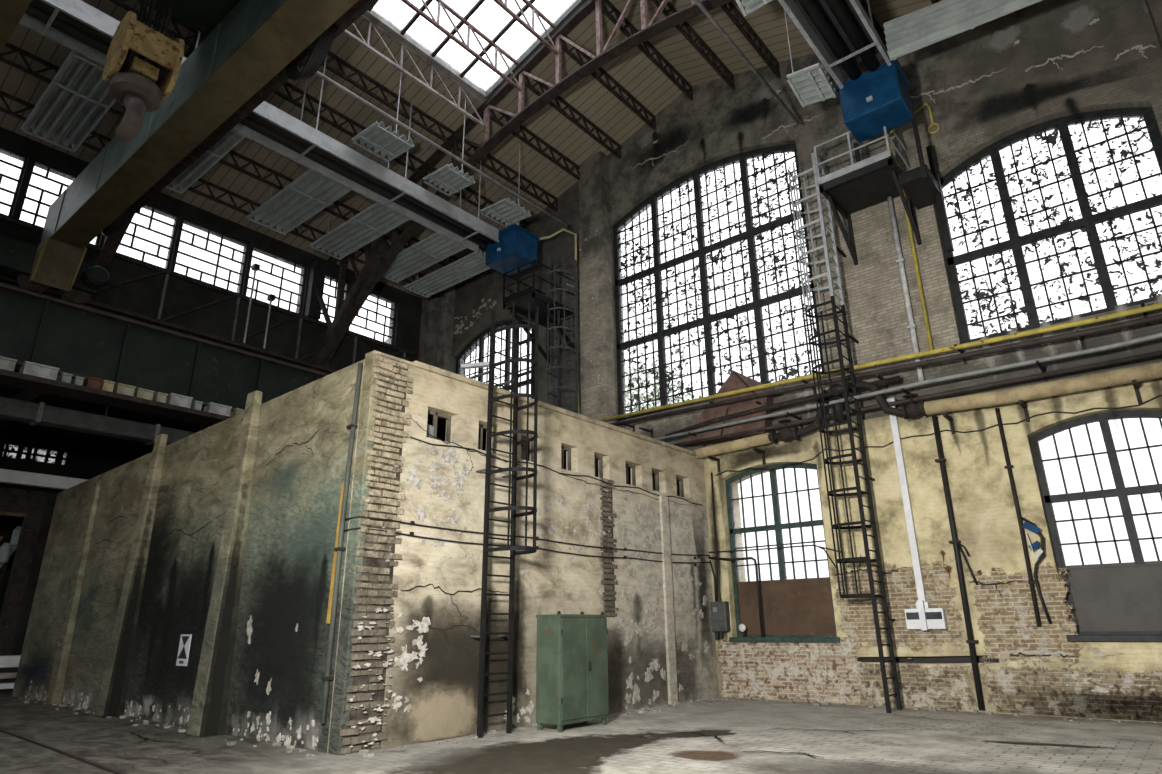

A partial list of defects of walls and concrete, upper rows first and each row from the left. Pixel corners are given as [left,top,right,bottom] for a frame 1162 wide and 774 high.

crack [910,44,1157,103]
peeling [125,697,191,727]
water stain [103,511,327,737]
peeling [232,711,319,750]
spalling [340,354,474,754]
crack [401,584,505,646]
spalling [510,477,684,710]
spalling [673,530,1162,721]